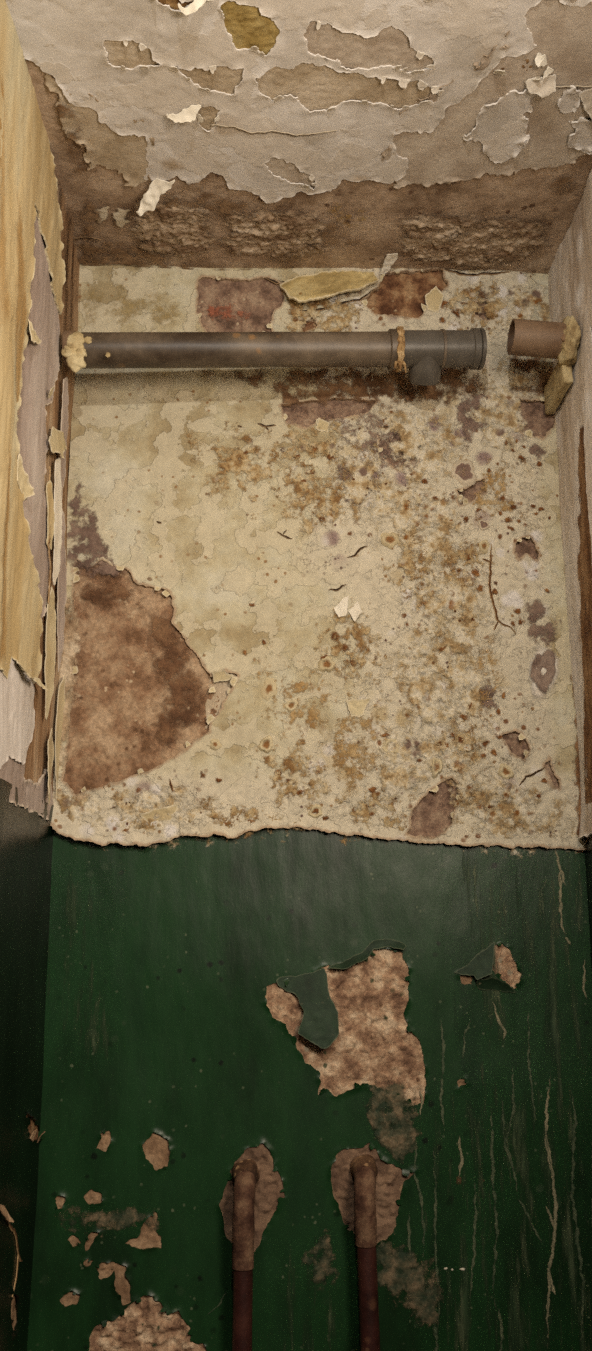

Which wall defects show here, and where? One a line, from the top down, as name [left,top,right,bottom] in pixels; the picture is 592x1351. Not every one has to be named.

peeling [103,0,444,131]
water stain [56,105,194,331]
flaking render [130,178,328,261]
flaking render [197,215,550,332]
water stain [478,267,551,326]
water stain [67,484,139,606]
peeling [14,377,238,806]
water stain [203,356,592,856]
water stain [149,616,202,744]
efflorescence [54,783,212,847]
flaking render [265,949,426,1106]
flaking render [68,1232,207,1351]